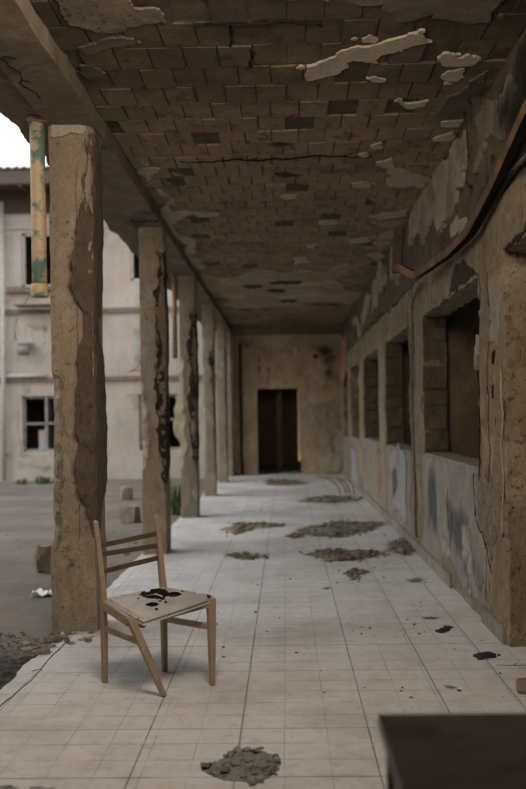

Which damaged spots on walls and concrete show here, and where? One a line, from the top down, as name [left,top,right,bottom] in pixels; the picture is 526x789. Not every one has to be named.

crack [0,56,41,99]
peeling [56,0,166,55]
peeling [296,0,505,85]
peeling [137,74,517,338]
spalling [49,125,108,551]
spalling [153,251,214,516]
peeling [478,282,499,365]
damp [442,502,486,599]